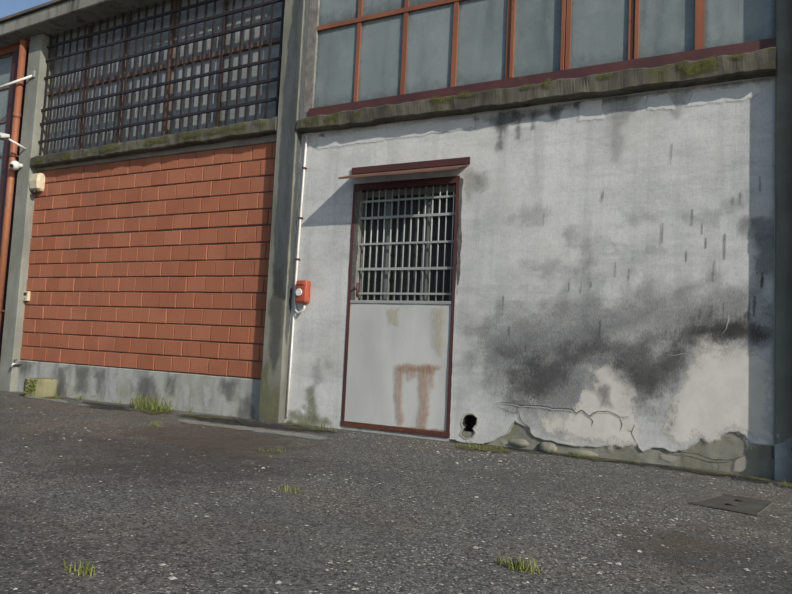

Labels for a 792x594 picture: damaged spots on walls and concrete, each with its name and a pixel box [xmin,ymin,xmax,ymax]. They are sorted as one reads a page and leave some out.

damp [490,109,560,130]
damp [692,321,766,341]
rust [342,364,447,434]
crack [496,402,636,442]
peeling [450,323,792,482]